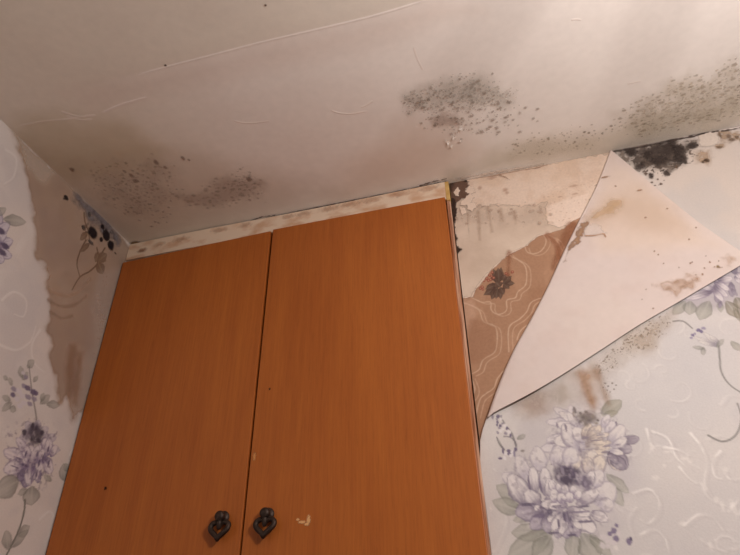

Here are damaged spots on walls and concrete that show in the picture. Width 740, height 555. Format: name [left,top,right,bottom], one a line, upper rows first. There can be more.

water stain [404,80,526,134]
water stain [614,138,709,186]
water stain [716,131,740,148]
peeling [454,153,609,227]